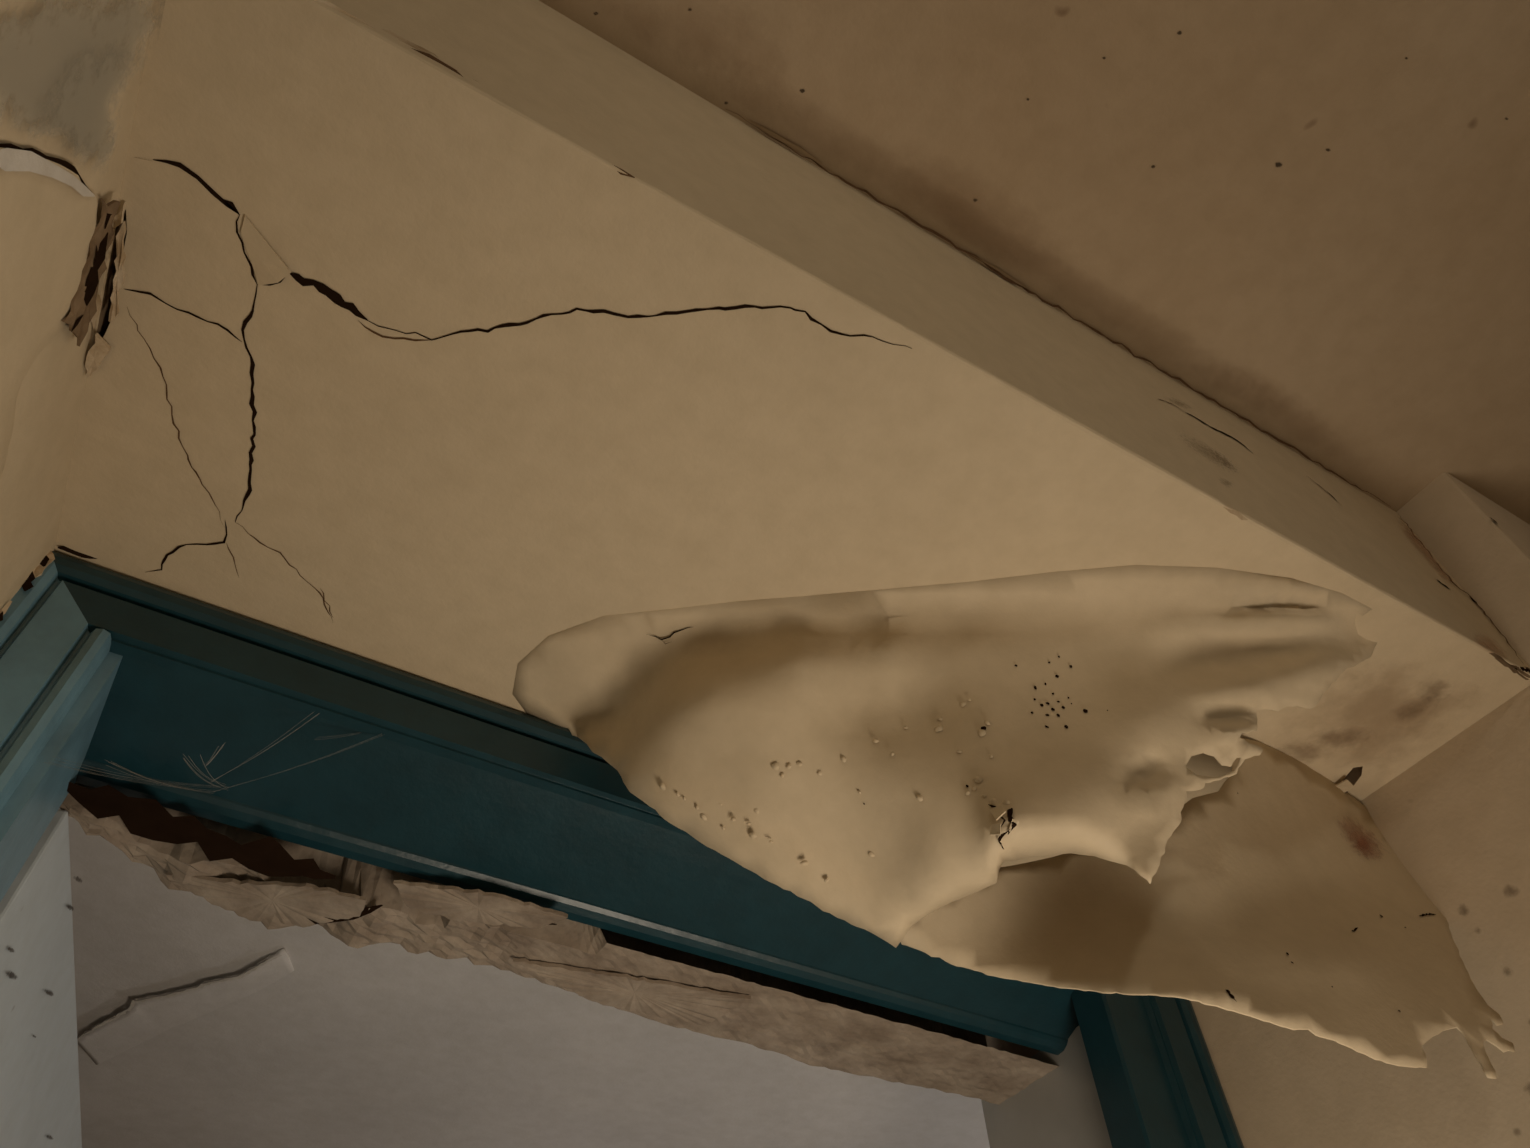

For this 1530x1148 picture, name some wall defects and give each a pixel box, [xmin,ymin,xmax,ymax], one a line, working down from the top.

crack [0,143,95,197]
crack [125,157,912,618]
crack [726,109,1523,663]
spalling [0,546,97,621]
spalling [60,782,1059,1105]
peeling [901,738,1515,1079]